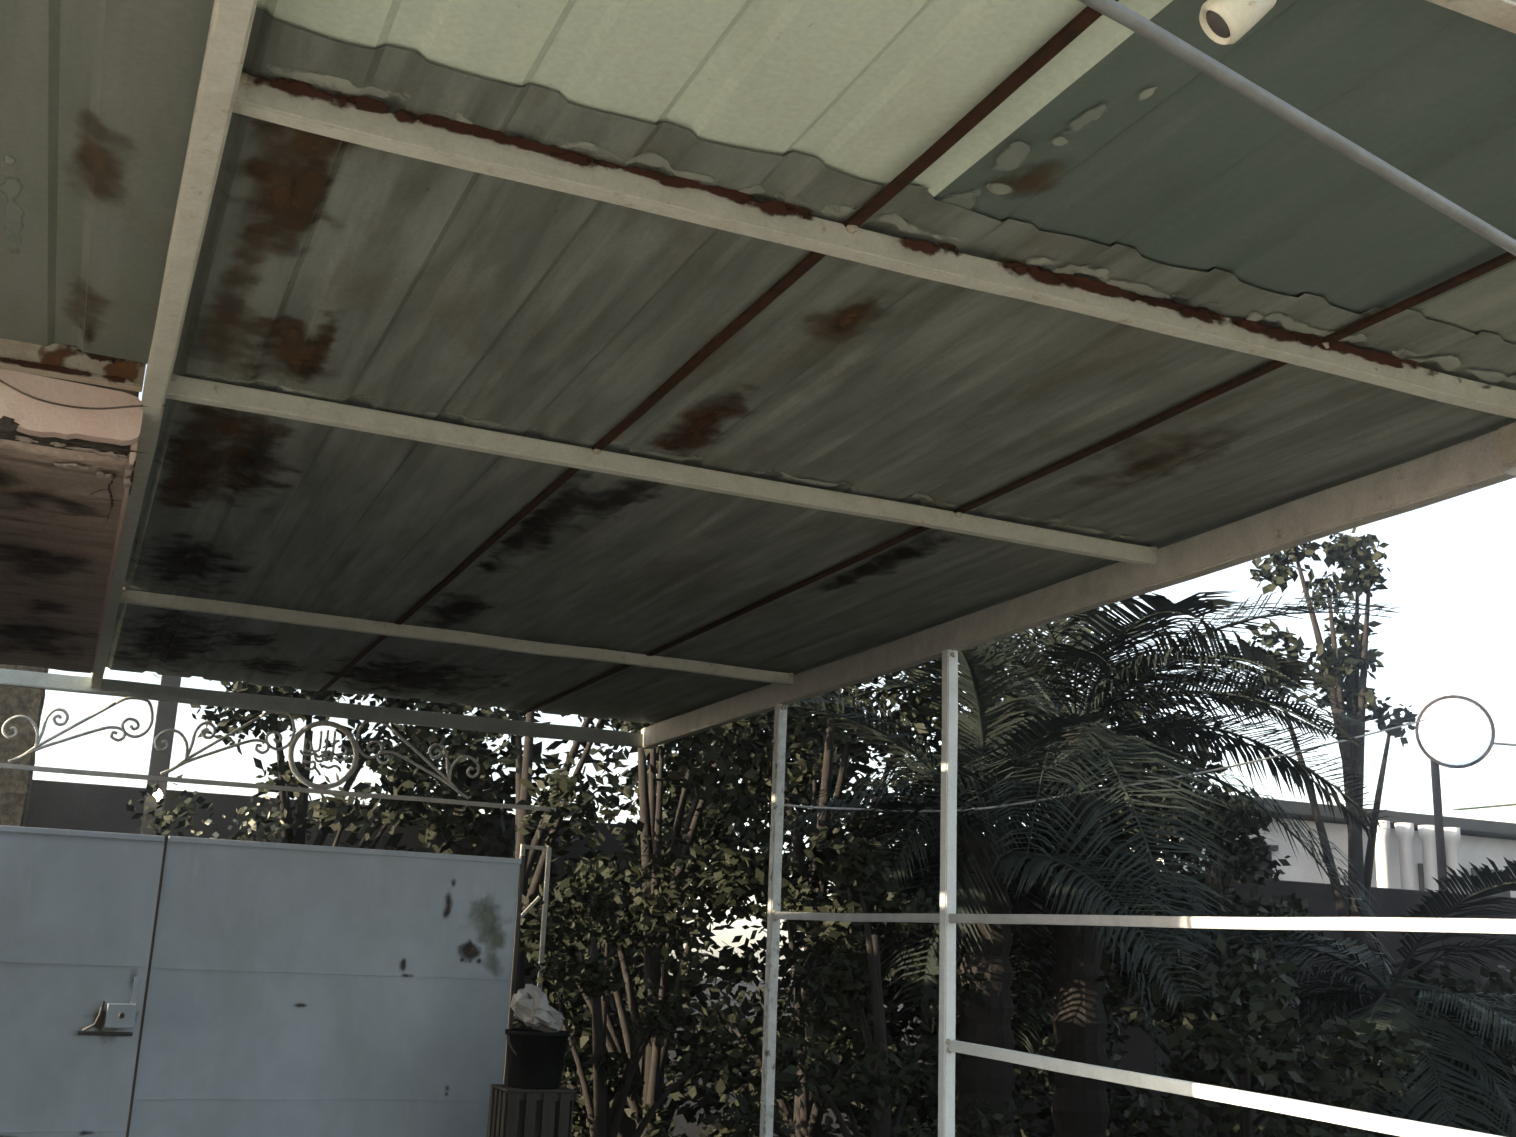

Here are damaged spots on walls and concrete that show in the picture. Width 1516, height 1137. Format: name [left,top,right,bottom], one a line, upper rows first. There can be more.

rust [238,120,354,284]
rust [253,76,813,221]
peeling [939,141,1031,210]
peeling [1052,104,1107,146]
peeling [1139,88,1156,100]
rust [902,238,961,256]
rust [0,290,143,383]
rust [1001,261,1438,375]
rust [653,394,747,456]
water stain [0,474,95,515]
water stain [0,603,81,656]
water stain [479,904,504,971]